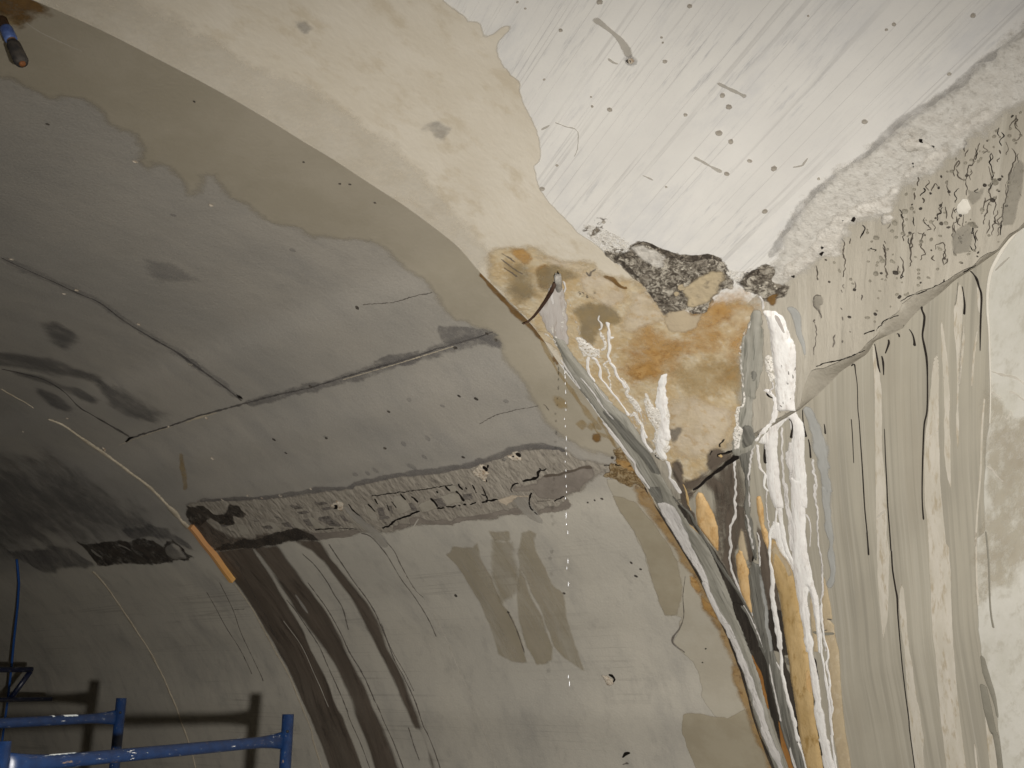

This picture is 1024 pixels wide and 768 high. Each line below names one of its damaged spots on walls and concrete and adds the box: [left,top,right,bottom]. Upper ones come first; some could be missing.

leakage [78,538,192,566]
leakage [186,505,436,768]
crack [133,332,493,438]
spalling [187,443,610,552]
rust [480,247,754,490]
peeling [632,246,664,267]
leakage [511,258,837,768]
rust [635,483,765,751]
leakage [771,33,1024,285]
crack [813,116,1022,367]
leakage [974,399,1024,606]